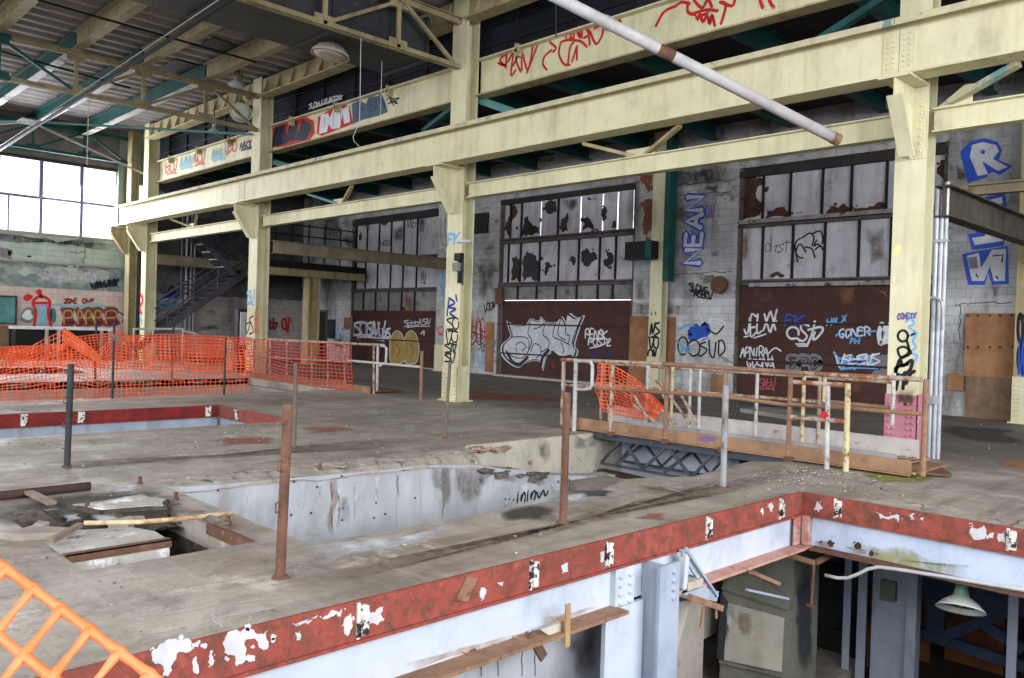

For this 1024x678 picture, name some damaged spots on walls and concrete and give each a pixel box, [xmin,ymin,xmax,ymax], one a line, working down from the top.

peeling [18,255,109,283]
leakage [318,486,356,526]
leakage [436,472,489,501]
leakage [505,476,609,519]
leakage [330,529,430,553]
peeling [969,523,1006,543]
leakage [871,549,941,571]
peeling [294,608,355,640]
peeling [369,607,384,625]
peeling [150,623,277,677]